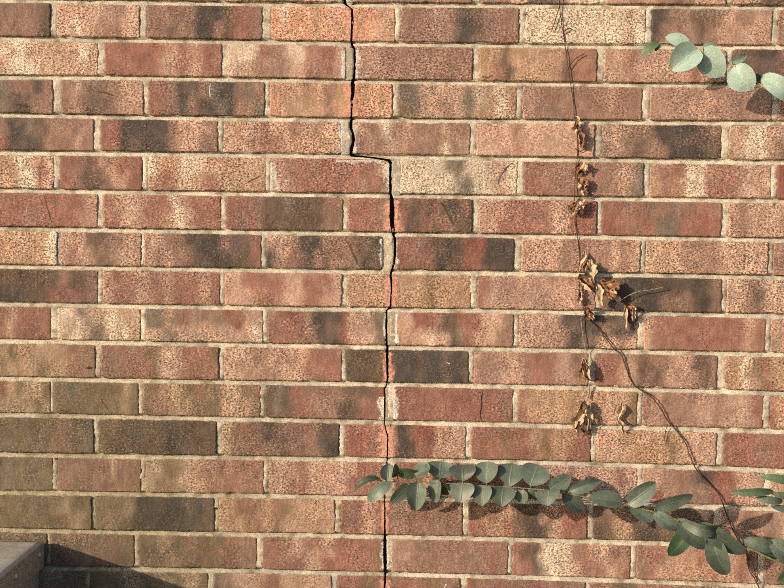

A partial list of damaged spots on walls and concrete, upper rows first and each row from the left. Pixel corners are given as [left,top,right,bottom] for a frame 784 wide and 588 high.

crack [344,0,396,464]
crack [381,494,389,588]